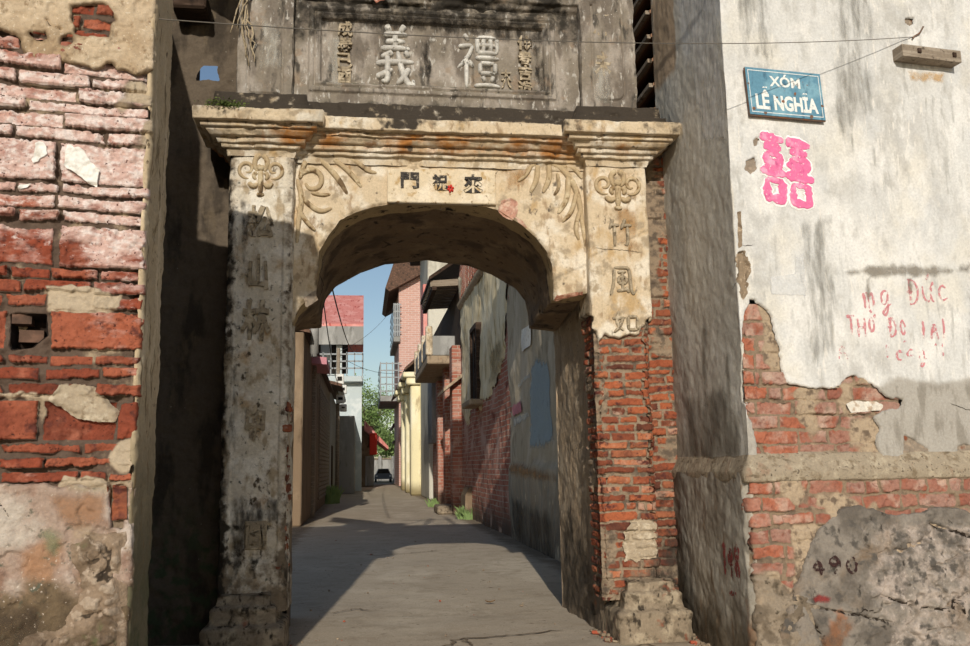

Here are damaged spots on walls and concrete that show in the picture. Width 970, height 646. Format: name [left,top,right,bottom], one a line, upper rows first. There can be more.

water stain [323,7,544,54]
spalling [0,5,155,646]
spalling [581,316,661,601]
spalling [735,211,900,454]